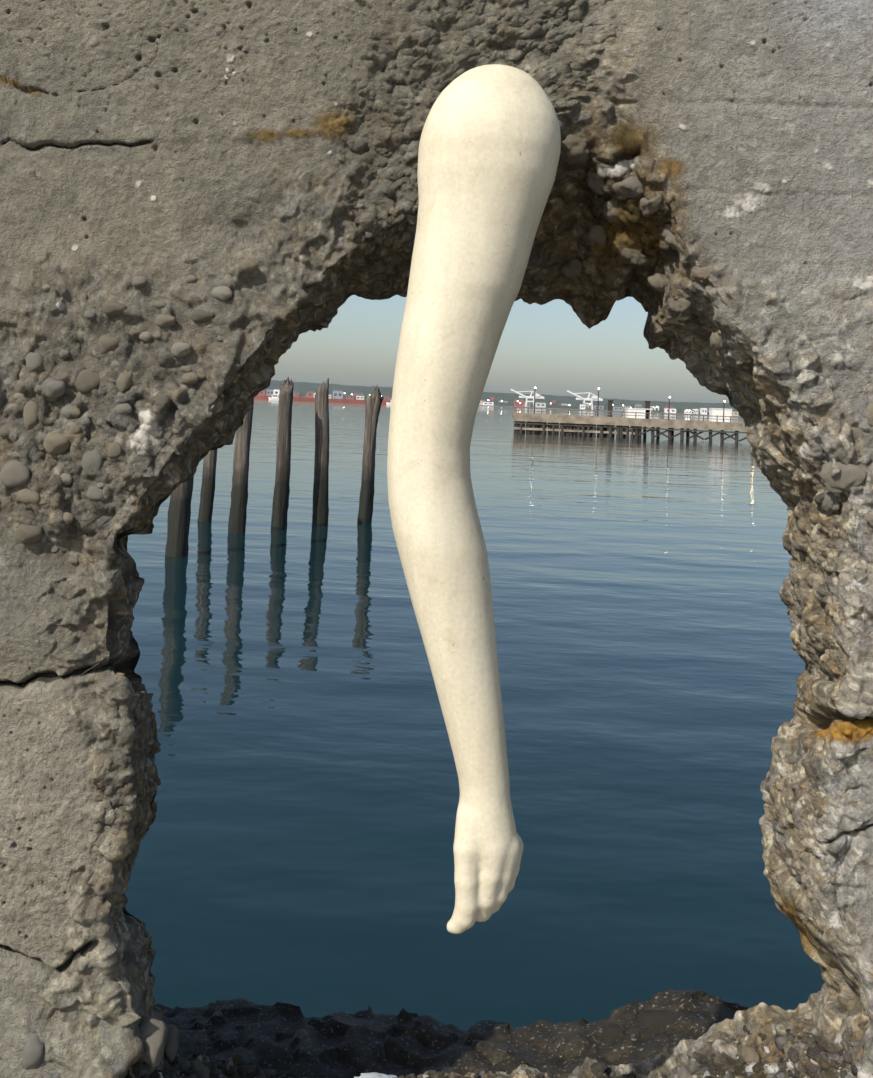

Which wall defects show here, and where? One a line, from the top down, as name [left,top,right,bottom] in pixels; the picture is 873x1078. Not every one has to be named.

spalling [336,0,618,259]
crack [2,139,153,151]
peeling [723,183,770,218]
spalling [559,135,692,317]
peeling [851,273,873,290]
spalling [709,332,725,351]
peeling [832,339,856,368]
crack [0,661,113,688]
spalling [763,443,849,924]
spalling [82,701,161,918]
crack [56,941,93,971]